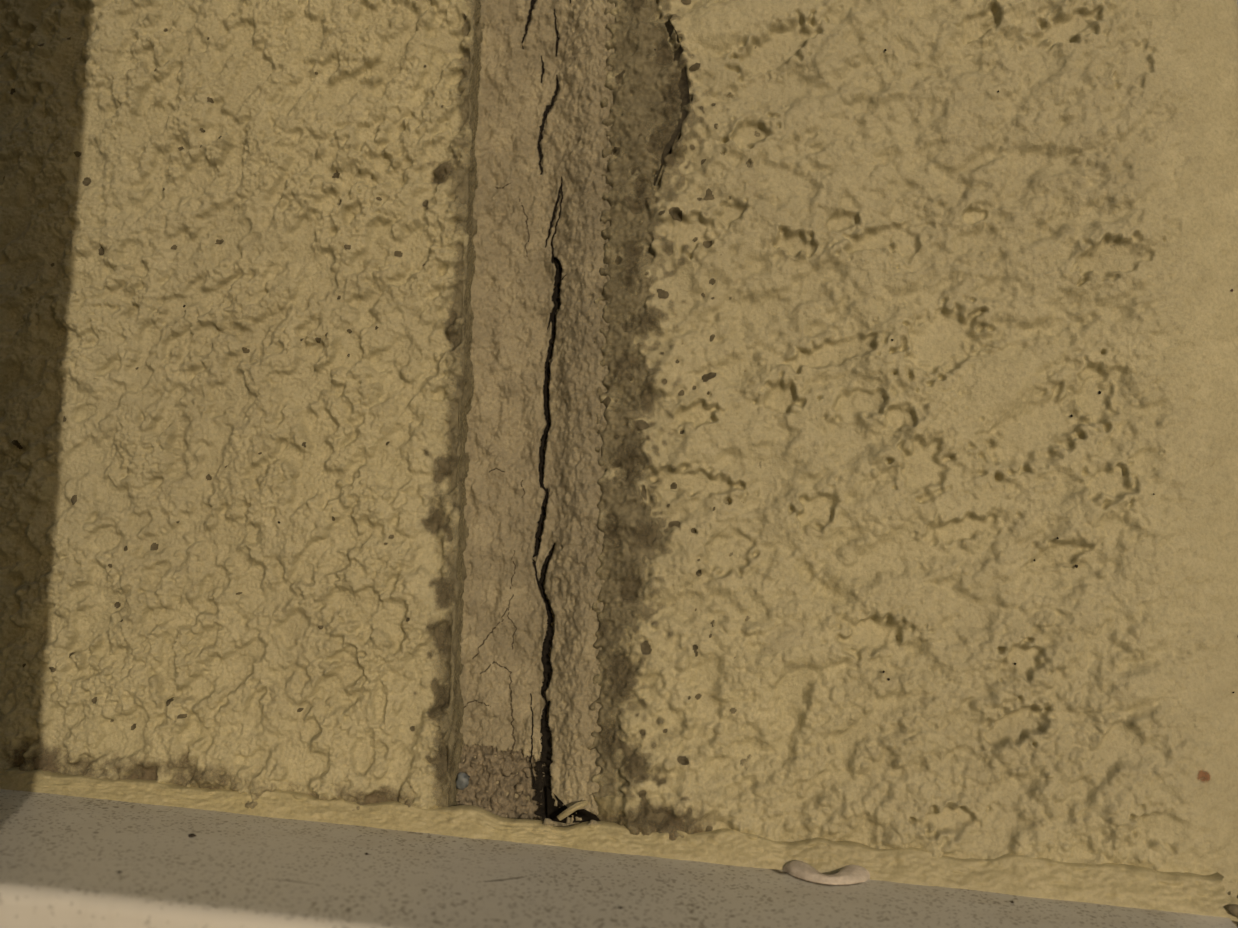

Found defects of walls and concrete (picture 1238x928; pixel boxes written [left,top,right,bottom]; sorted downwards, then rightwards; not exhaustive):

crack [463,0,571,821]
peeling [1225,895,1238,924]